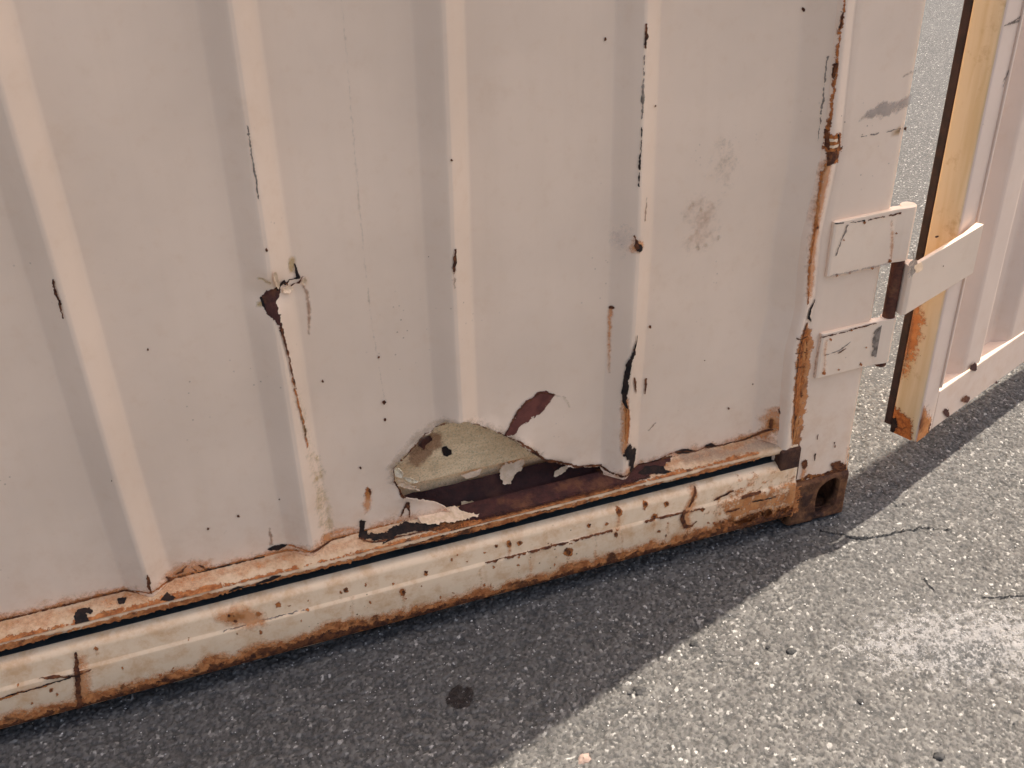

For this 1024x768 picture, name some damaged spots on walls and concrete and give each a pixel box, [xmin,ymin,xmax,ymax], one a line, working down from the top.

corrosion [901,306,925,376]
corrosion [0,0,850,729]
peeling [499,391,555,485]
corrosion [890,404,932,442]
peeling [394,468,420,491]
peeling [461,469,482,479]
peeling [418,501,479,525]